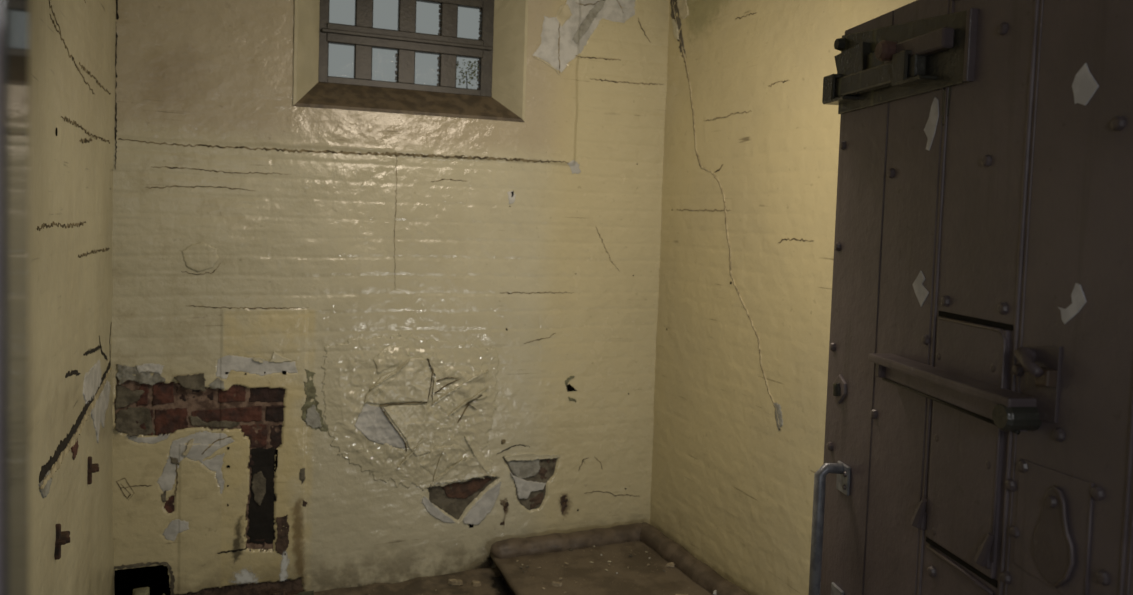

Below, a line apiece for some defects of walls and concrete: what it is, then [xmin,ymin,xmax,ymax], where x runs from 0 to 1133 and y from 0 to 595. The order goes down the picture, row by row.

peeling [533,0,635,75]
crack [37,221,110,258]
crack [49,0,567,283]
crack [575,2,783,431]
crack [39,322,112,498]
flaking render [114,353,298,555]
flaking render [421,453,559,528]